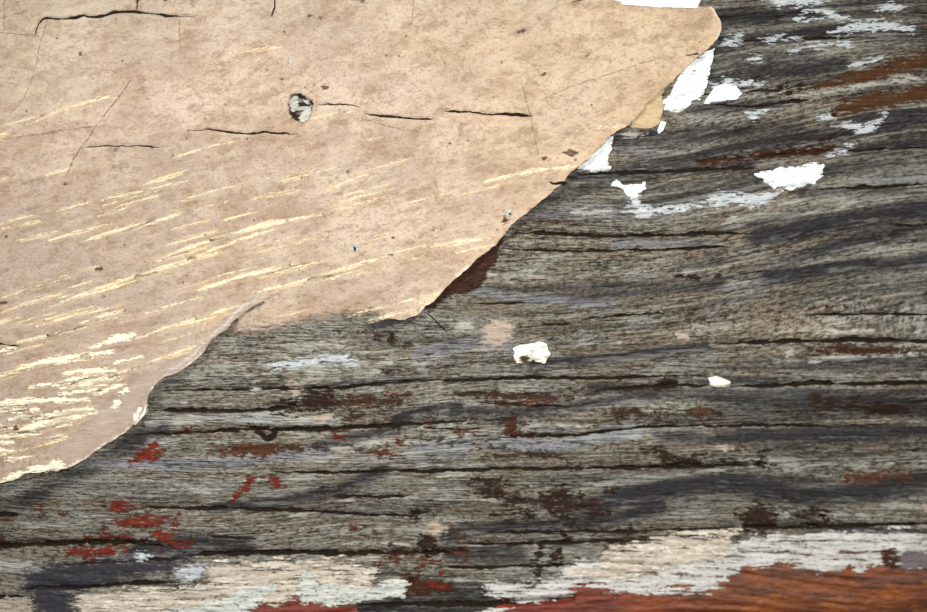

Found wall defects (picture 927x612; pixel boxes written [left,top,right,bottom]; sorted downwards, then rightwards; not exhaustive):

peeling [757,0,916,55]
peeling [848,51,888,68]
crack [319,103,530,120]
peeling [0,0,787,483]
crack [505,230,752,252]
crack [719,312,927,345]
crack [138,374,927,441]
crack [143,464,765,517]
peeling [64,497,187,562]
peeling [172,562,208,583]
crack [0,521,927,599]
peeling [898,550,927,571]